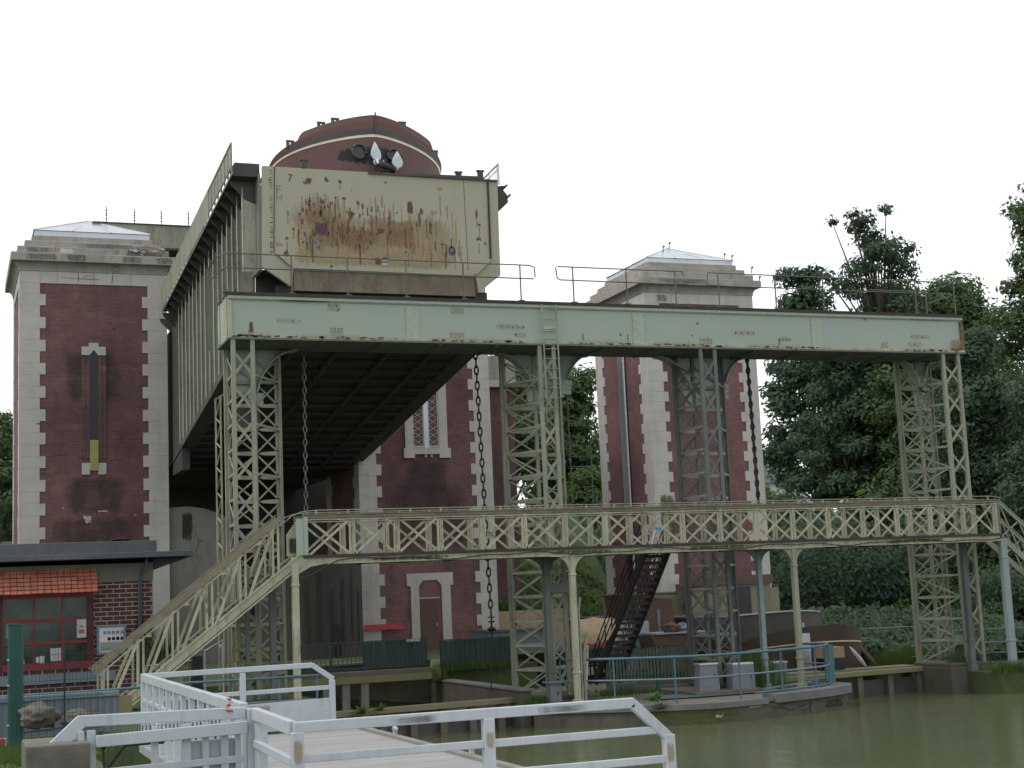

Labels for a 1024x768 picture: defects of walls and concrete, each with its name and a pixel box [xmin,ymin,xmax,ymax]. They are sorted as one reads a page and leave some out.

corrosion [284,177,462,271]